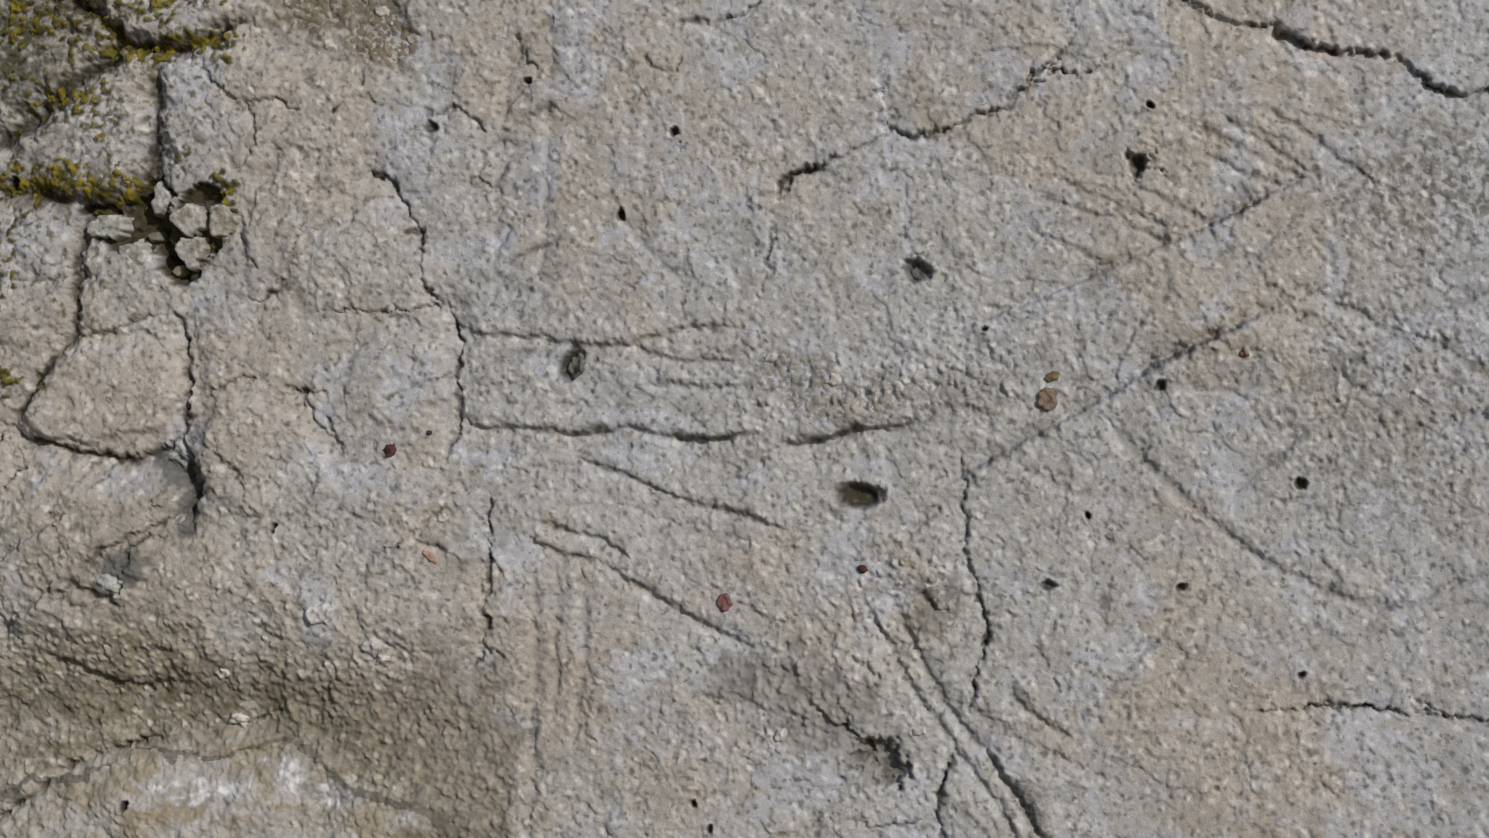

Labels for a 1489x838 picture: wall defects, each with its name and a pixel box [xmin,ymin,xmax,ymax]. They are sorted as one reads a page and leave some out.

crack [1275,33,1386,57]
crack [901,122,966,140]
crack [0,0,230,498]
crack [374,174,424,249]
crack [778,165,816,193]
crack [454,324,462,419]
crack [482,552,493,628]
crack [974,602,991,696]